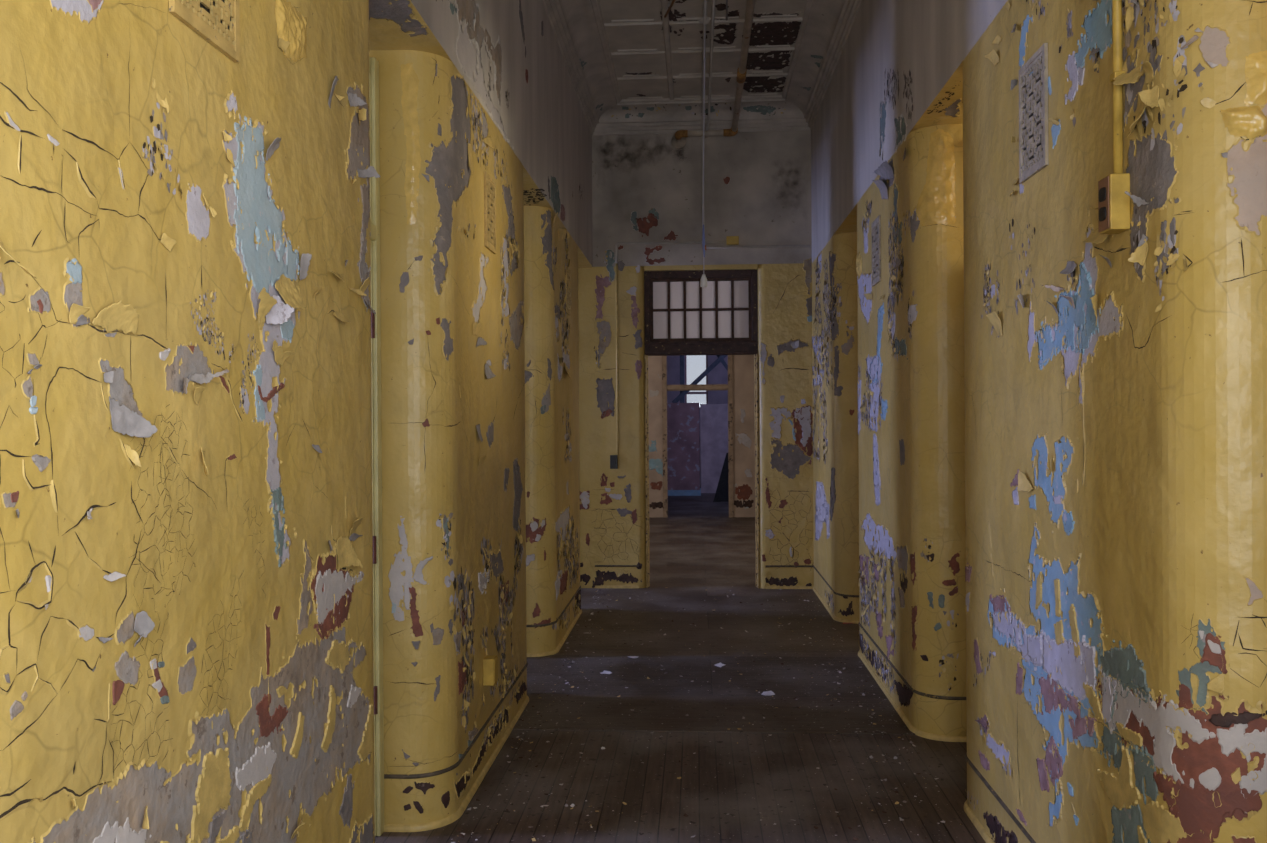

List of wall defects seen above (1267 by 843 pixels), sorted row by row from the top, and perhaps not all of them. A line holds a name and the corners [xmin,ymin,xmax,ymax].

peeling [21,352,51,472]
peeling [0,239,90,328]
crack [0,3,265,820]
peeling [27,76,380,843]
peeling [397,0,585,467]
peeling [388,439,663,814]
peeling [595,0,803,119]
peeling [734,68,1267,843]
peeling [984,0,1048,90]
peeling [1009,0,1231,406]